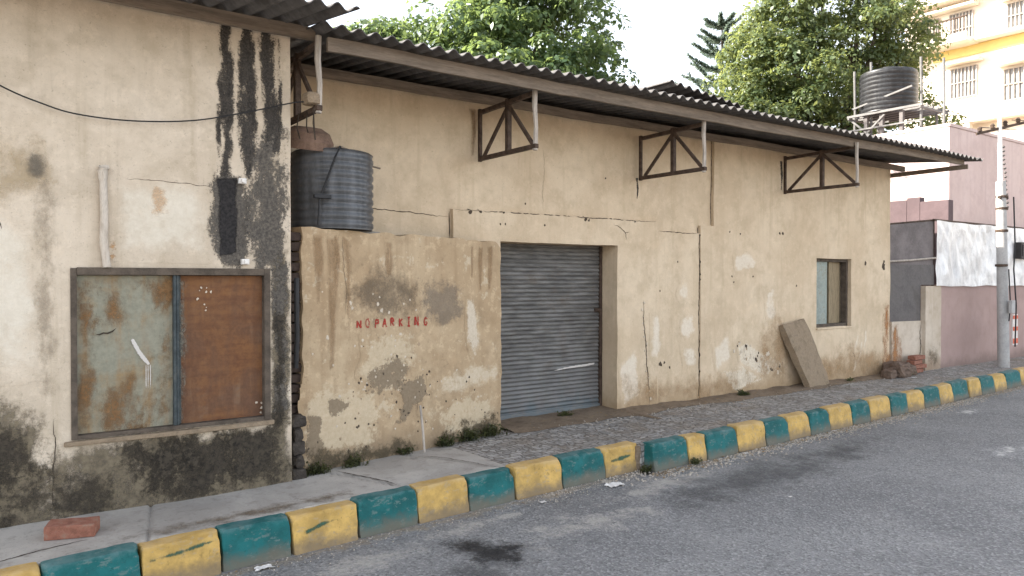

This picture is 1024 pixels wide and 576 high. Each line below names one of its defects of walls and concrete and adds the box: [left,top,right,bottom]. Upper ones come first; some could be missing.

water stain [208,25,284,268]
rust [102,376,146,430]
water stain [0,253,292,528]
crack [373,142,712,405]
flaking render [720,338,783,393]